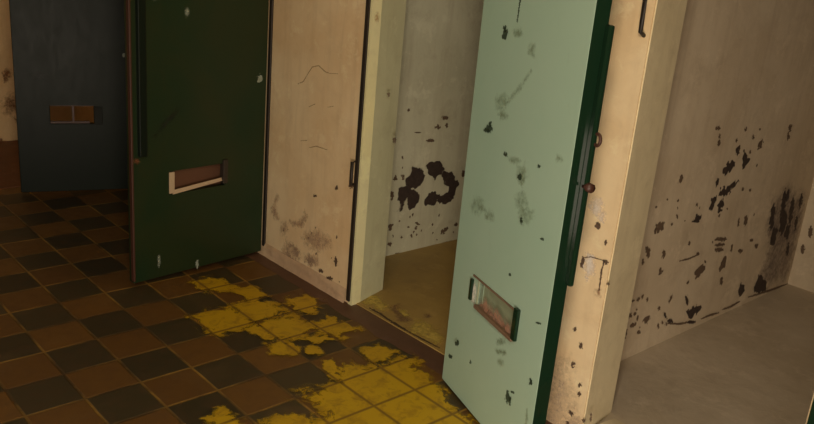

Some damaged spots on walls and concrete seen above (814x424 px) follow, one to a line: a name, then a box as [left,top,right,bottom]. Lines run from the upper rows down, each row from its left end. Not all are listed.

peeling [388,156,465,246]
peeling [654,127,764,234]
spalling [712,237,743,285]
damp [738,188,803,297]
peeling [185,260,480,424]
spalling [625,294,673,339]
damp [685,296,702,324]